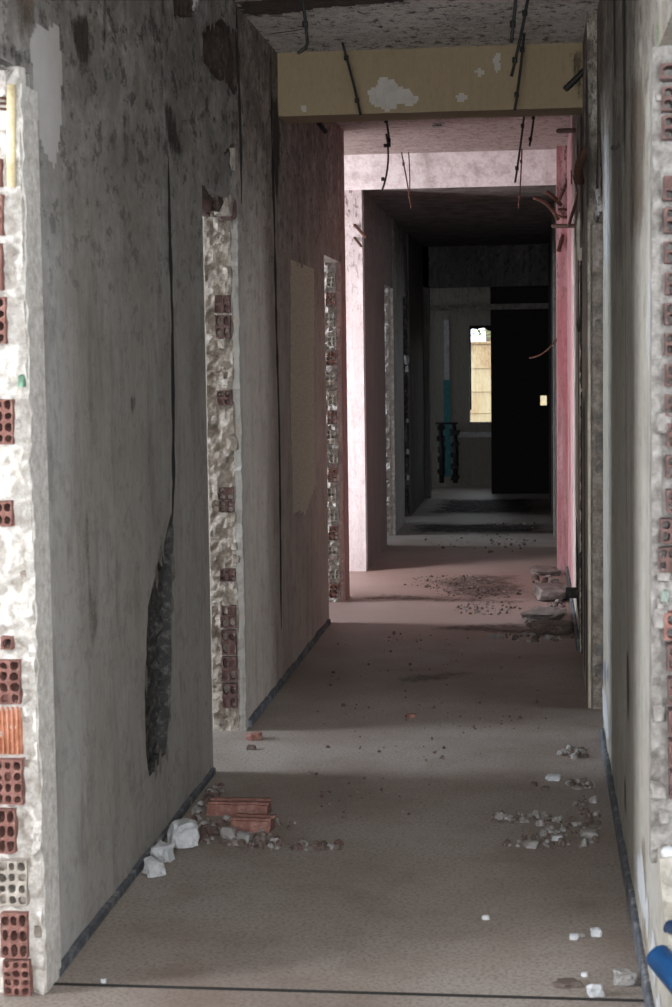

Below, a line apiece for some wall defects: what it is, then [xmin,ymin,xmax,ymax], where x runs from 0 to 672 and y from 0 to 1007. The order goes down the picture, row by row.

peeling [636,848,656,951]